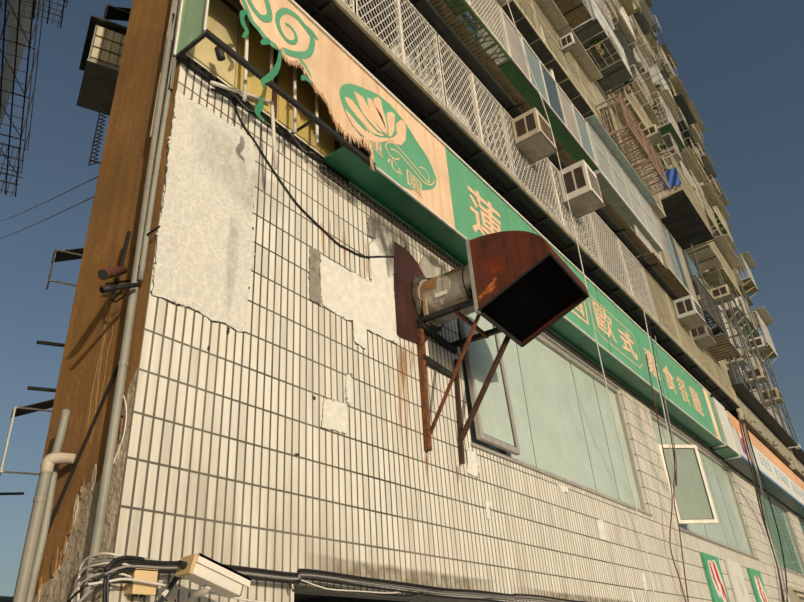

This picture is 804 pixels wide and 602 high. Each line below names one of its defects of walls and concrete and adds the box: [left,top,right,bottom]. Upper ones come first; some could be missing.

peeling [151,90,256,335]
peeling [308,217,398,350]
flaking render [312,373,353,434]
peeling [33,463,101,602]
peeling [93,368,138,602]